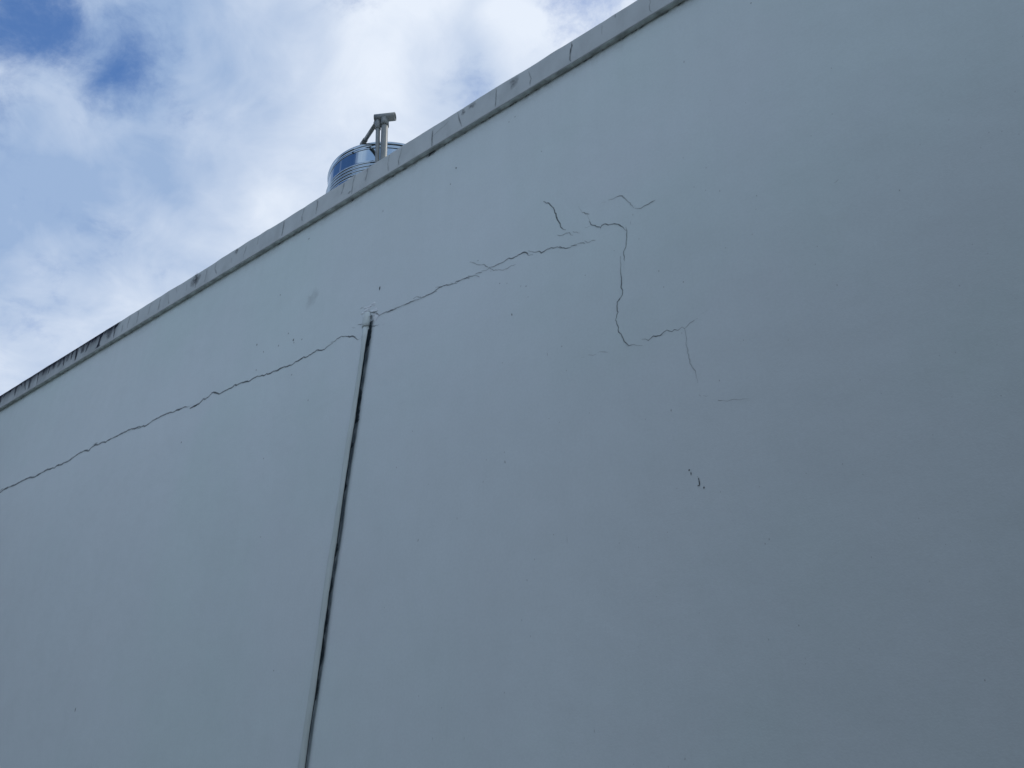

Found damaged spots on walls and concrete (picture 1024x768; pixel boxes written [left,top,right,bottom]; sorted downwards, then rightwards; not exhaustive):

crack [593,223,675,346]
crack [0,336,355,493]